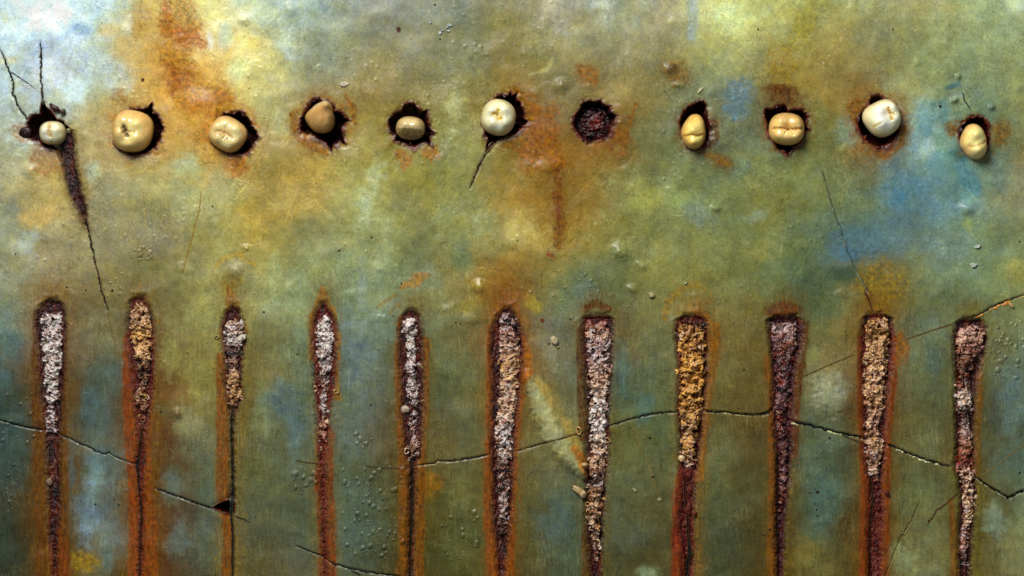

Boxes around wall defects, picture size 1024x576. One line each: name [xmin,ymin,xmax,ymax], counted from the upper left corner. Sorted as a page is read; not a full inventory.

corrosion [4,0,446,234]
corrosion [485,60,643,260]
corrosion [13,268,175,576]
crack [84,218,117,348]
crack [0,406,249,576]
corrosion [203,249,259,576]
crack [298,454,490,576]
corrosion [471,267,542,576]
corrosion [662,274,732,576]
crack [704,410,863,444]
crack [868,444,1024,576]
crack [906,295,1024,340]